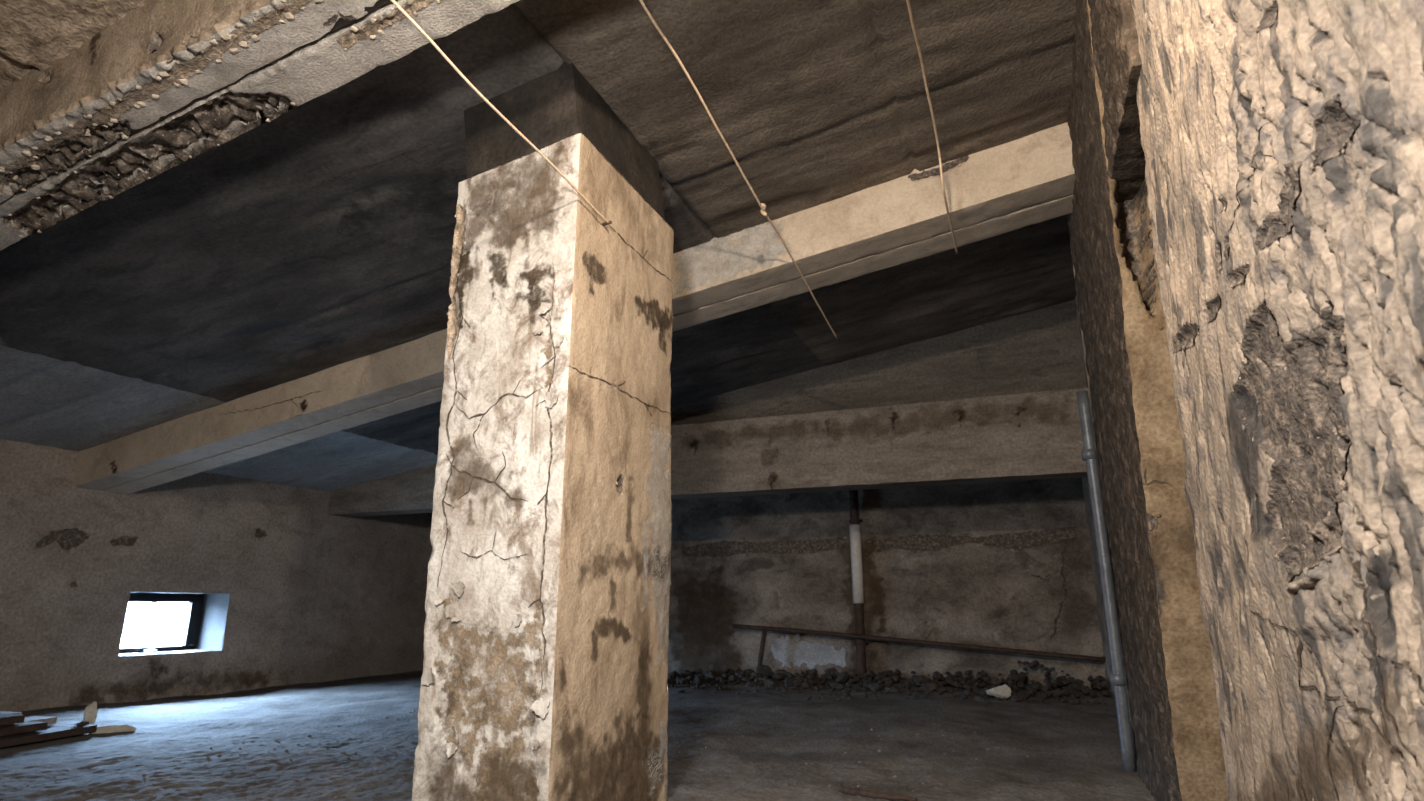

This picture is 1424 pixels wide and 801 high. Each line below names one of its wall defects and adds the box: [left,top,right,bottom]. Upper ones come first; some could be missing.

spalling [337,0,441,50]
spalling [0,0,324,238]
damp [582,253,606,294]
crack [609,225,672,282]
damp [635,296,673,352]
spalling [1114,179,1250,355]
damp [448,441,521,519]
crack [437,254,670,698]
spalling [1231,300,1352,583]
damp [581,477,670,658]
damp [431,746,536,801]
damp [555,646,668,801]